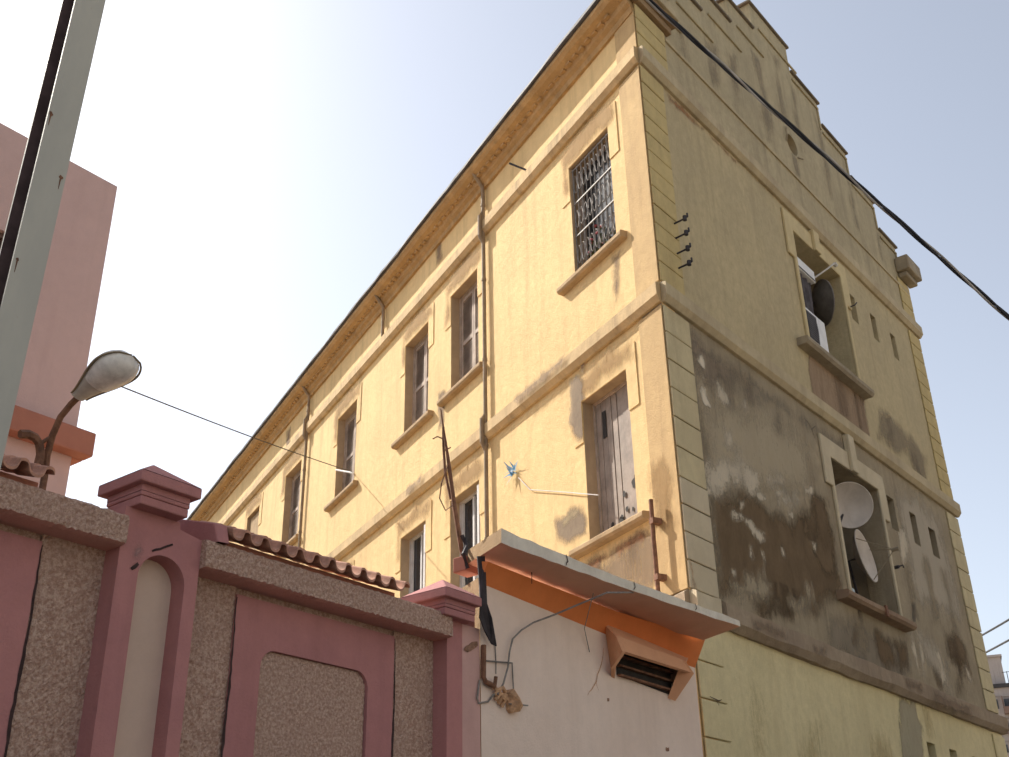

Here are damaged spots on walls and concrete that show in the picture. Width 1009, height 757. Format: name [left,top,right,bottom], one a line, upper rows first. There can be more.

peeling [700,382,730,408]
leakage [691,336,784,406]
leakage [809,355,869,436]
leakage [880,413,926,478]
leakage [591,532,658,588]
peeling [732,502,765,558]
leakage [706,493,841,637]
leakage [814,610,973,716]